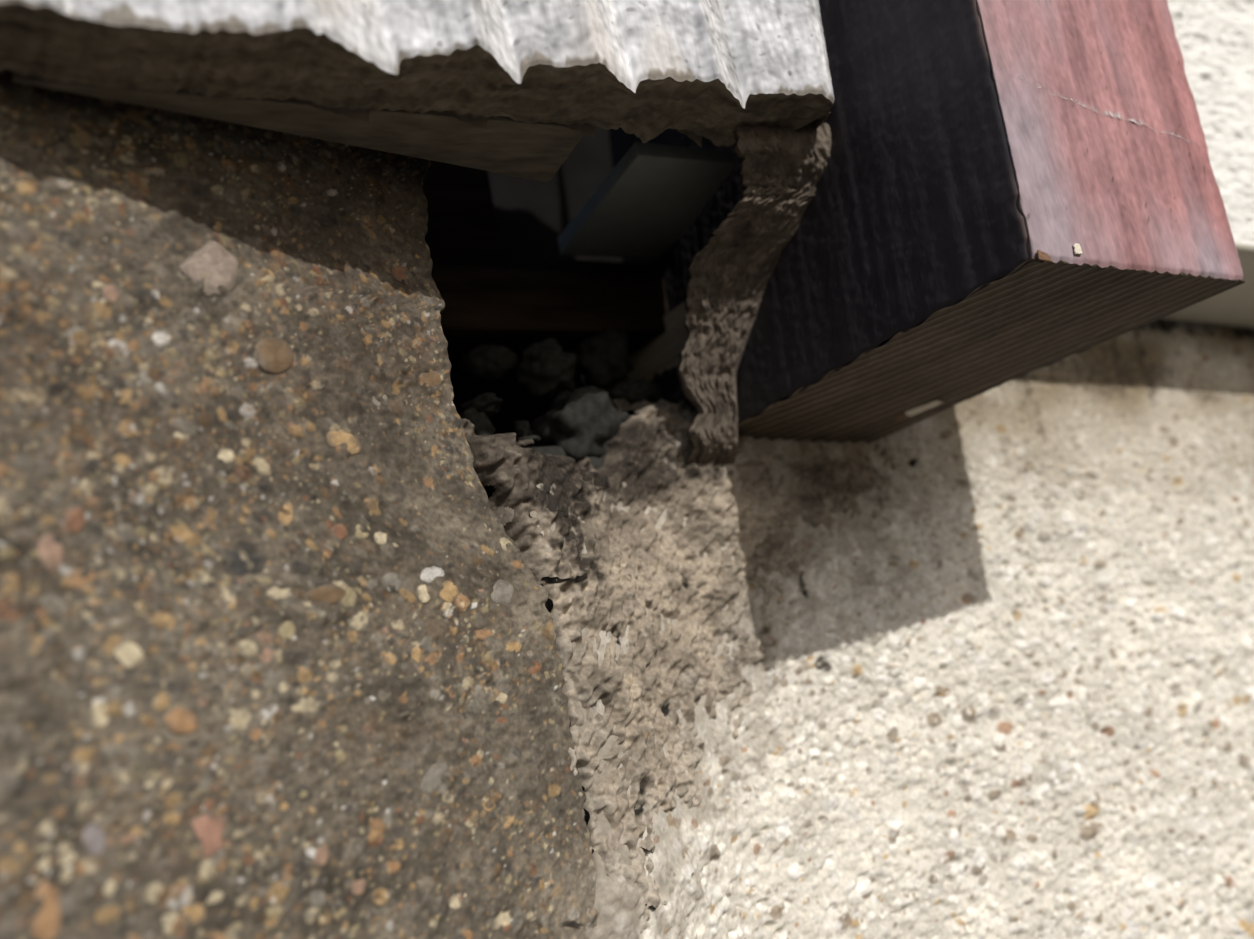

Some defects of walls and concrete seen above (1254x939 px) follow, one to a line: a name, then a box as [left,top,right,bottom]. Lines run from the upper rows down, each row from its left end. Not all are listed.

water stain [516,424,723,585]
crack [540,573,587,613]
crack [582,786,594,853]